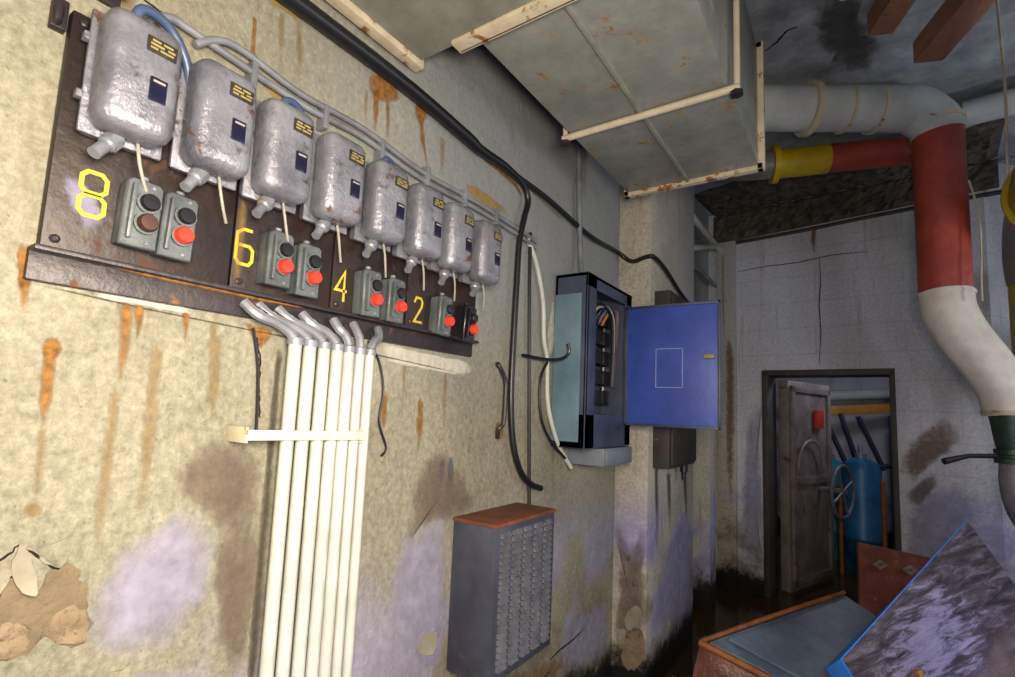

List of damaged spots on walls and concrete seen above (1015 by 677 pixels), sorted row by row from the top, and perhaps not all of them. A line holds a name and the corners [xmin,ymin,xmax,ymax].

water stain [820,0,873,64]
corrosion [371,76,397,125]
corrosion [416,105,426,156]
corrosion [121,304,143,366]
corrosion [41,338,61,413]
water stain [219,356,281,677]
crack [0,545,72,597]
flaking render [0,536,94,661]
water stain [116,533,194,628]